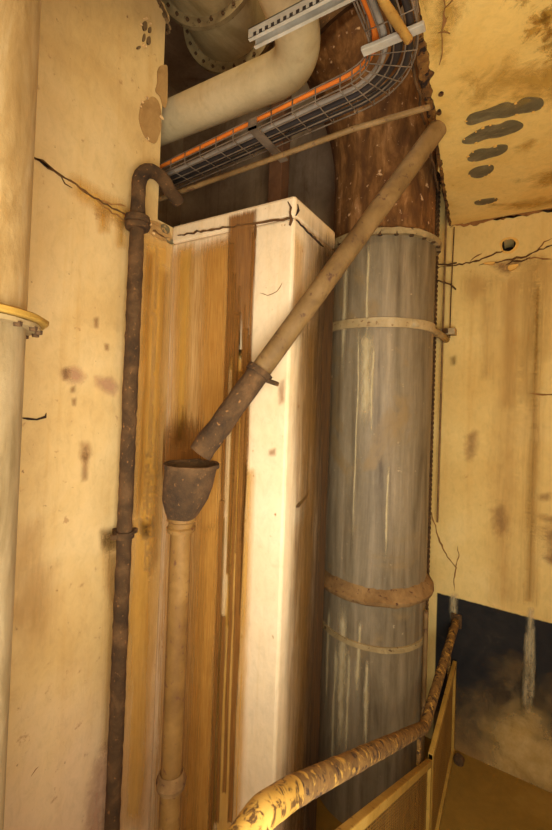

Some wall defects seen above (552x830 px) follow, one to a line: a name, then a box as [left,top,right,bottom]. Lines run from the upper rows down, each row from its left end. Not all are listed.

peeling [139,65,168,143]
crack [34,157,126,222]
crack [153,202,324,247]
crack [439,238,552,268]
crack [450,208,552,228]
rust [162,209,256,830]
crack [431,512,459,590]
leakage [524,610,534,712]